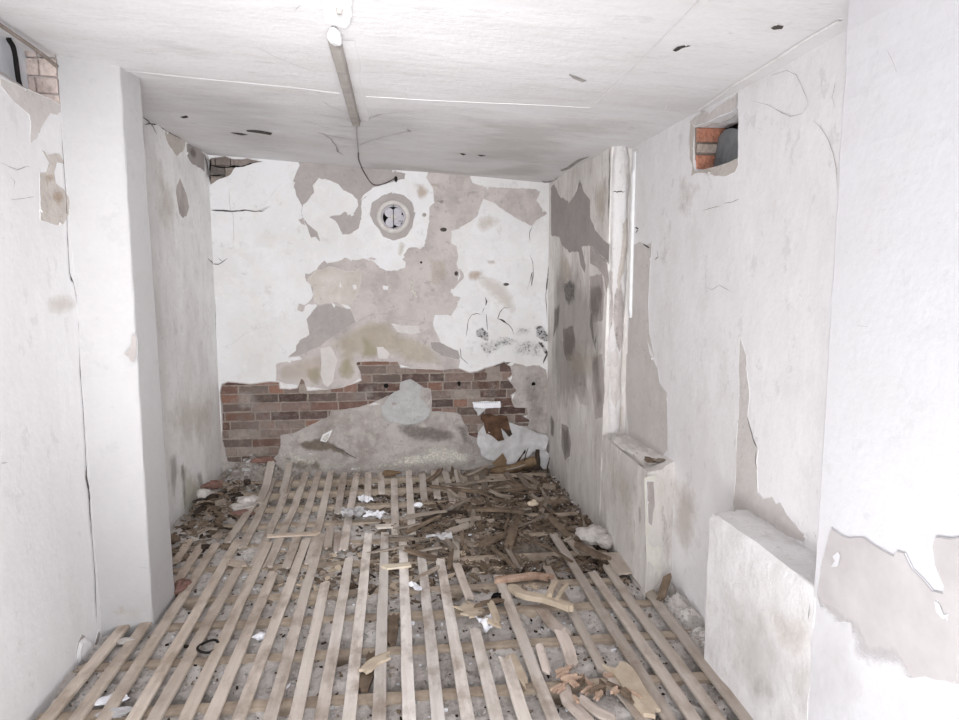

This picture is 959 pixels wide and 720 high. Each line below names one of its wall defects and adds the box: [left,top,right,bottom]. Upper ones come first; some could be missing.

spalling [0,51,70,226]
peeling [176,178,189,219]
flaking render [164,130,264,185]
crack [204,153,279,274]
flaking render [689,92,739,177]
crack [754,70,838,194]
peeling [220,162,610,475]
crack [460,298,514,364]
crack [80,370,97,616]
peeling [733,335,808,543]
peeling [817,528,959,686]